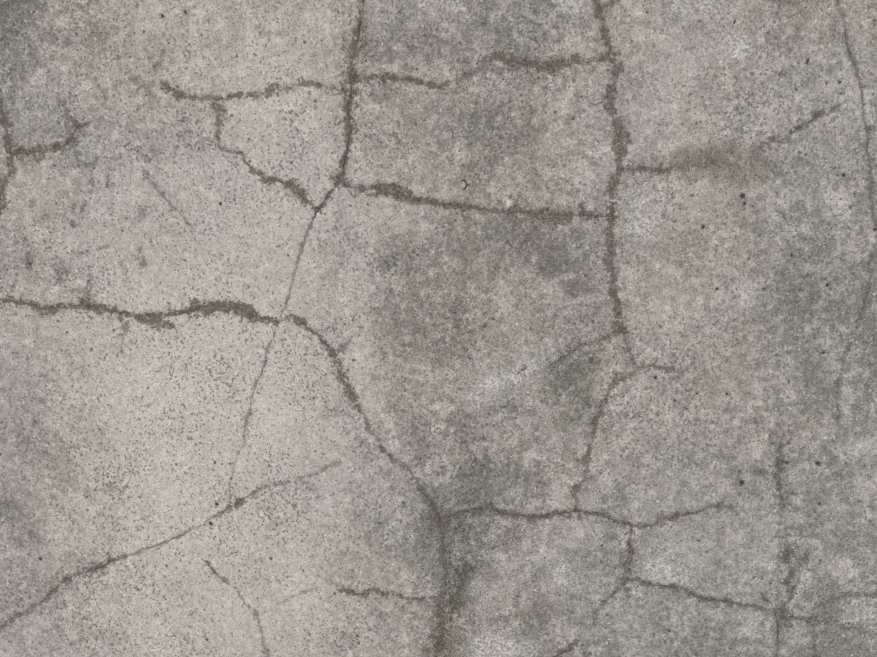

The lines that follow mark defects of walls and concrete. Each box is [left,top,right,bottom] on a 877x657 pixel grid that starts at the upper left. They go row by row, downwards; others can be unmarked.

crack [0,88,85,219]
crack [160,0,667,385]
crack [763,107,833,151]
crack [0,287,790,649]
crack [779,547,801,586]
crack [542,643,578,657]